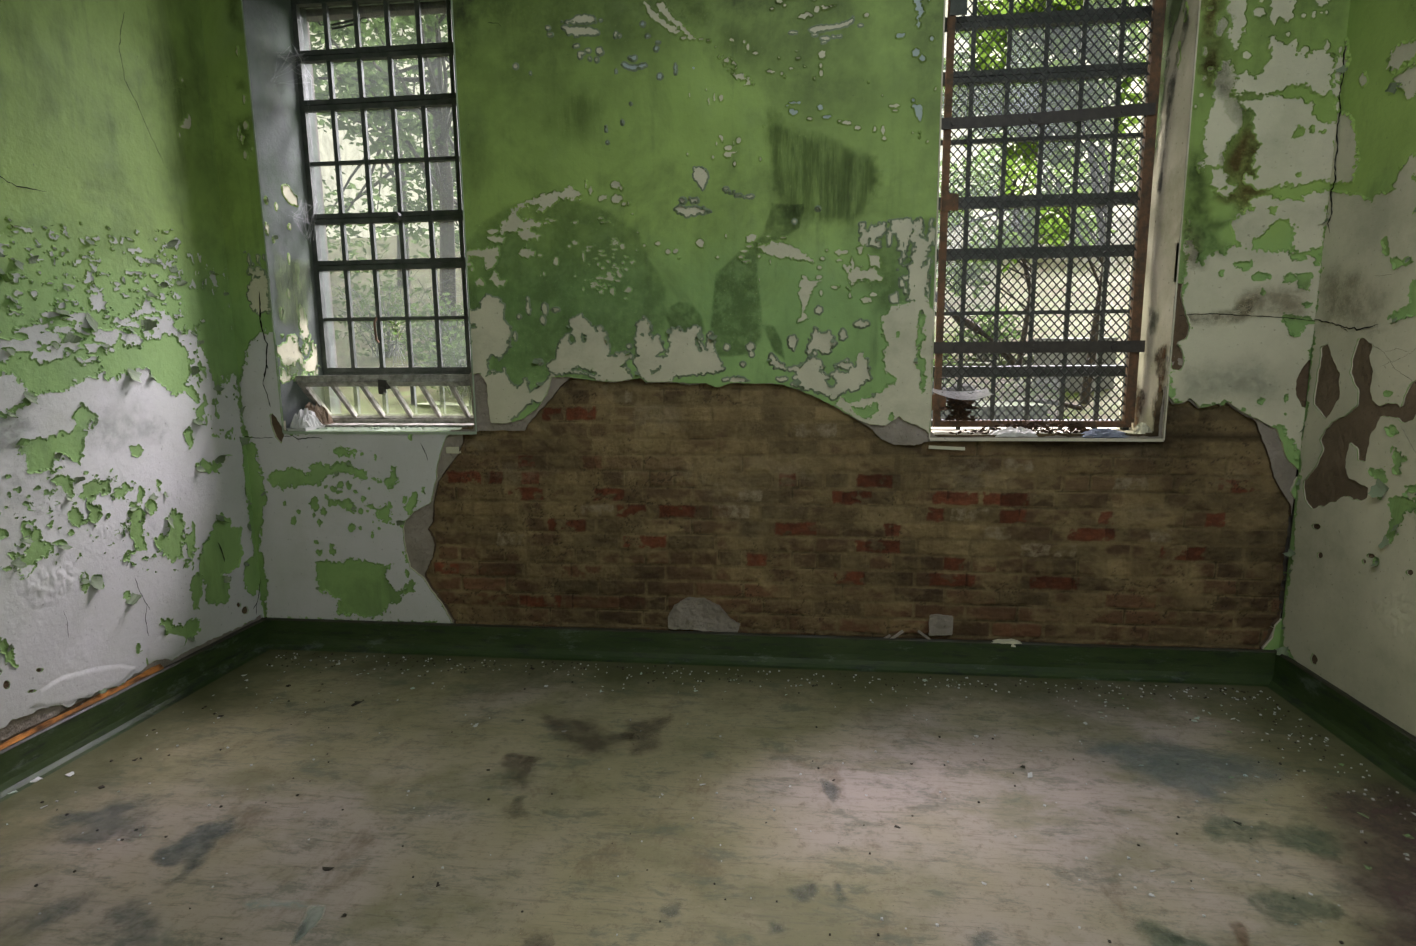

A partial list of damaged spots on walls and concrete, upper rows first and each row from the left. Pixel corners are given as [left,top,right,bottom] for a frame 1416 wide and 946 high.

flaking render [0,0,1416,750]